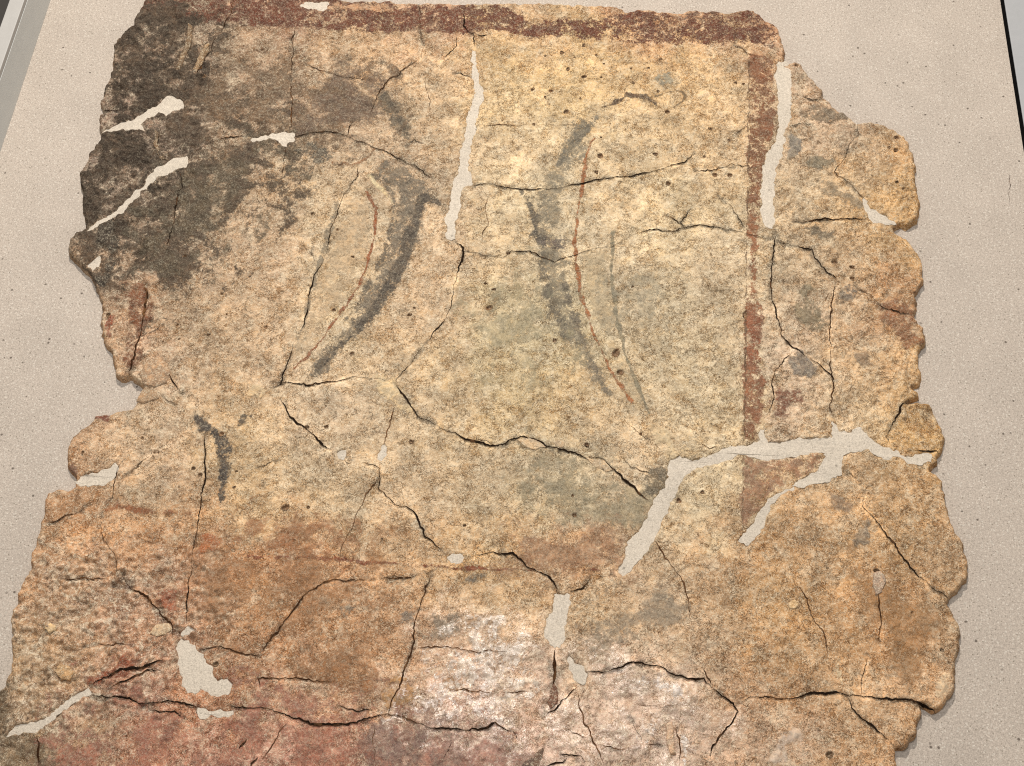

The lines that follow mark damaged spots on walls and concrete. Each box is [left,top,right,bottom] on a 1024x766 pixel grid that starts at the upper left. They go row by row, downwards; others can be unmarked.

crack [282,30,430,176]
crack [442,8,485,77]
crack [129,287,148,371]
crack [201,125,949,766]
crack [42,436,206,635]
crack [76,643,197,717]